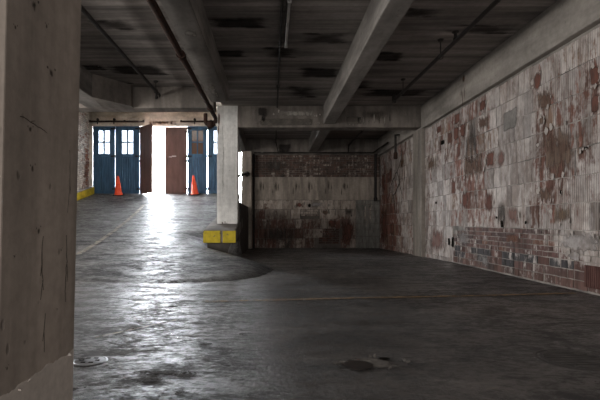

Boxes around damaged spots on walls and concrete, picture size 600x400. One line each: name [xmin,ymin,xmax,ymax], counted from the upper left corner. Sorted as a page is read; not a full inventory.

damp [213,18,264,28]
damp [302,67,338,77]
peeling [590,62,600,116]
peeling [477,100,488,132]
peeling [531,71,589,180]
peeling [436,113,504,180]
peeling [451,179,468,209]
peeling [486,191,527,227]
peeling [536,187,570,226]
crack [39,236,47,352]